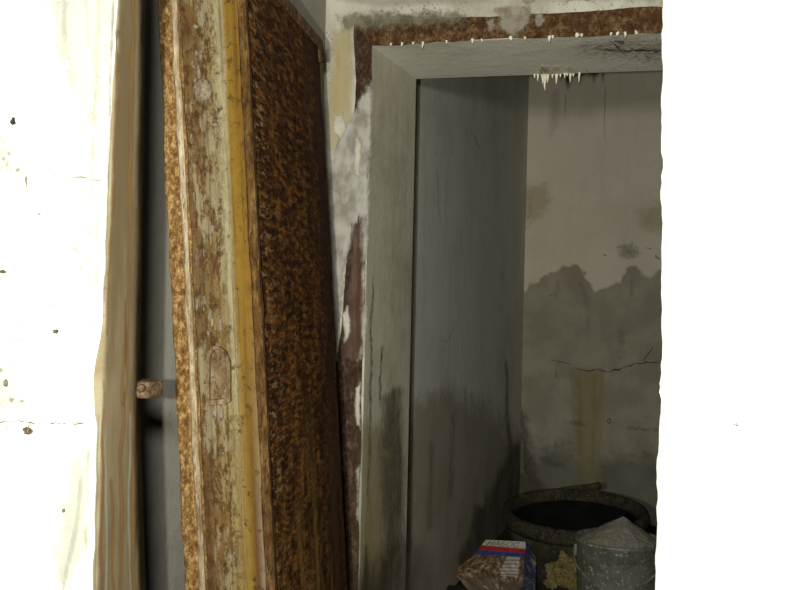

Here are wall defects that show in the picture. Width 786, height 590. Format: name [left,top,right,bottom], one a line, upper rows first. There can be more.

peeling [328,83,373,360]
water stain [355,265,662,590]
crack [552,346,660,372]